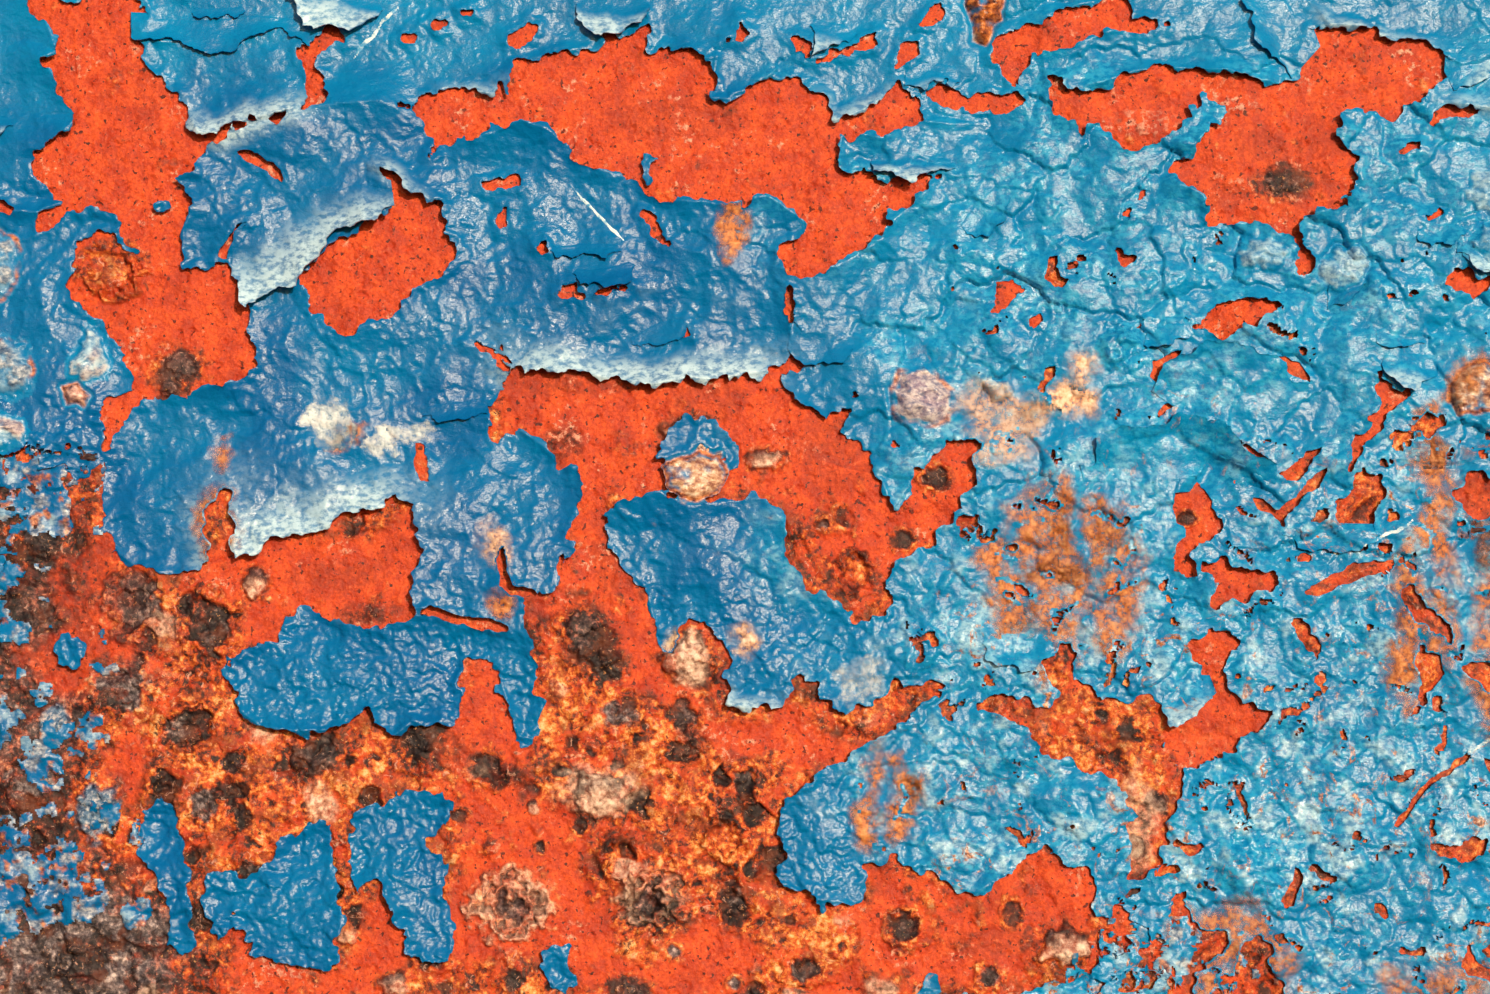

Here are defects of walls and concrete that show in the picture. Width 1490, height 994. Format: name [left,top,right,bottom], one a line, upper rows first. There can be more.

peeling [0,0,1490,777]
crack [1233,440,1327,527]
crack [1305,559,1400,596]
rust [1311,356,1490,716]
rust [0,441,461,994]
peeling [90,624,773,994]
rust [485,448,1303,994]
peeling [804,831,1096,994]
rust [1263,618,1329,736]
rust [1333,807,1488,884]
crack [1394,753,1470,828]
crack [1411,645,1490,714]